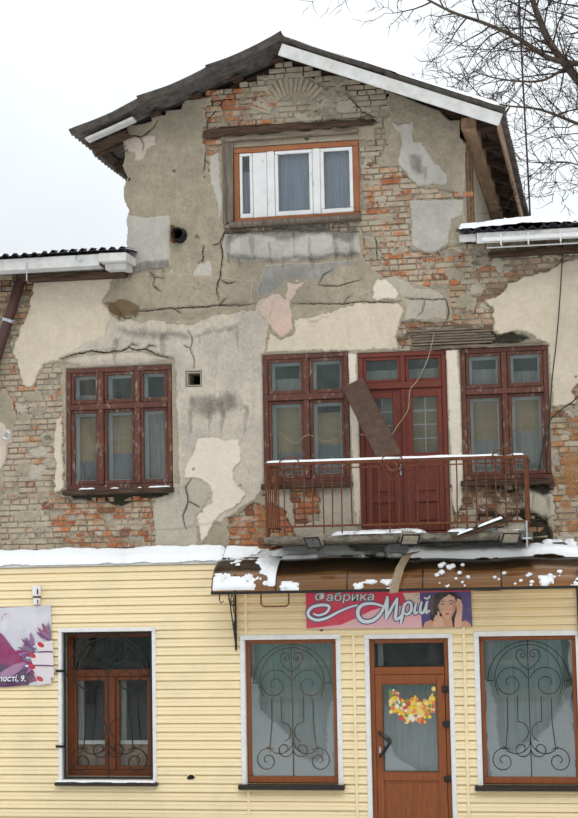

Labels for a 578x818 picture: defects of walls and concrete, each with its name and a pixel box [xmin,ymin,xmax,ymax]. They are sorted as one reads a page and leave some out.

crack [130,228,251,313]
peeling [0,61,578,550]
crack [292,270,449,323]
crack [60,330,195,367]